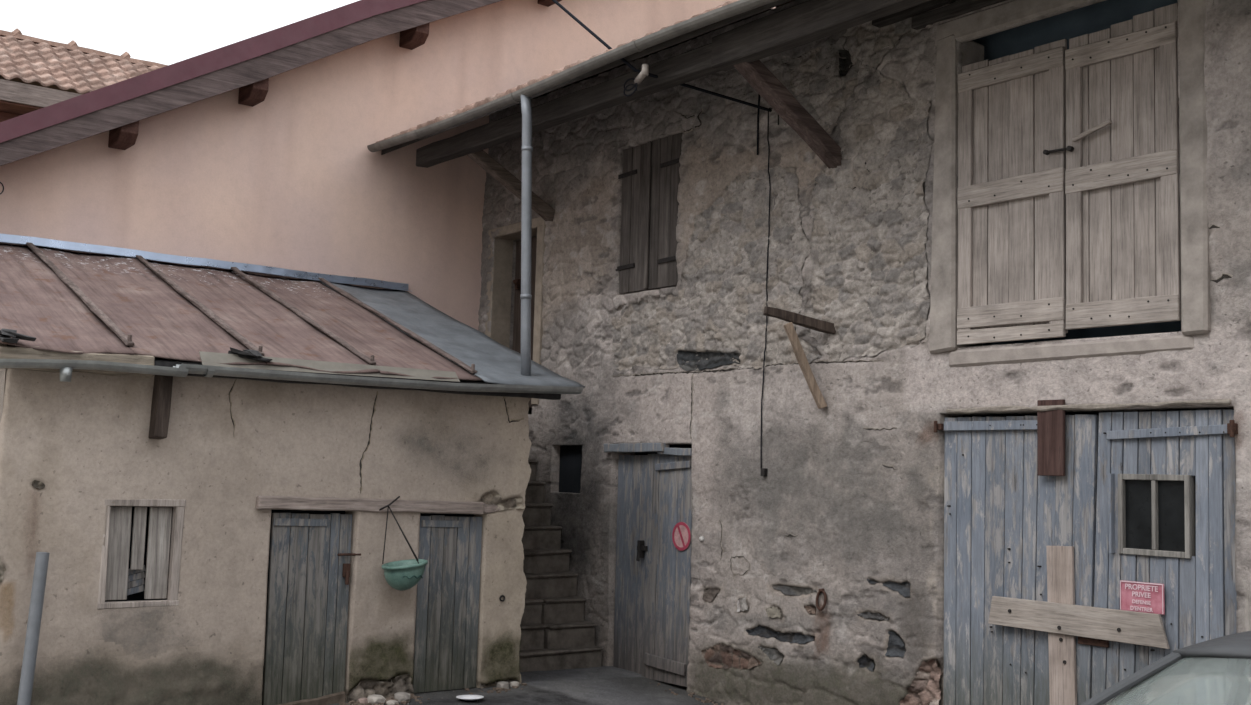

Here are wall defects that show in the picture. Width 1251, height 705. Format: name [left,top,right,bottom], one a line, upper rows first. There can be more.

crack [1211,273,1233,283]
crack [229,379,237,438]
crack [359,391,378,494]
damp [0,660,262,705]